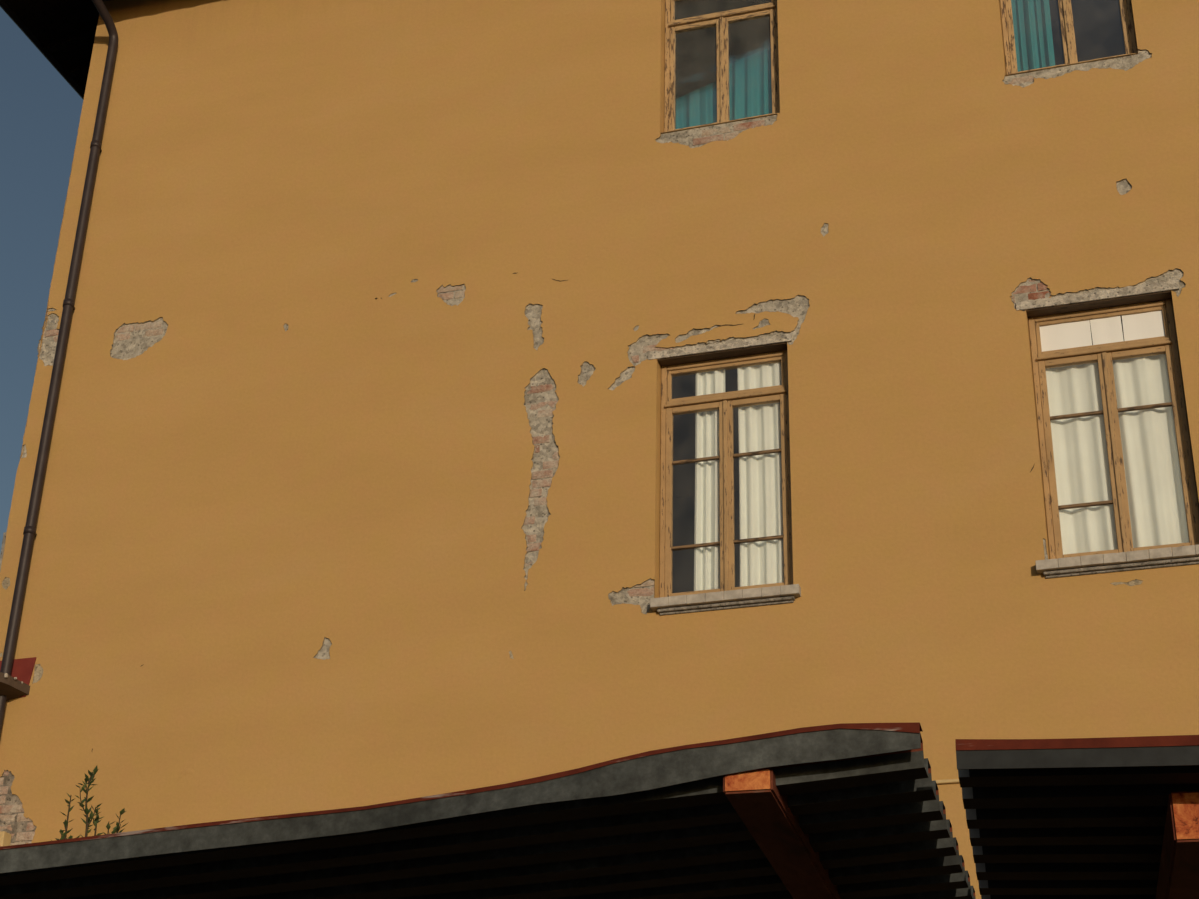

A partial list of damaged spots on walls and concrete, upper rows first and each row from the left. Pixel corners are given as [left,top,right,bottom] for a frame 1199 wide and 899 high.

spalling [1002,49,1152,87]
spalling [655,115,777,148]
spalling [436,284,466,306]
spalling [1010,268,1186,311]
spalling [37,308,59,366]
spalling [110,317,168,360]
spalling [524,303,544,350]
spalling [608,295,810,390]
spalling [521,368,560,591]
spalling [608,578,655,615]
spalling [0,769,37,845]